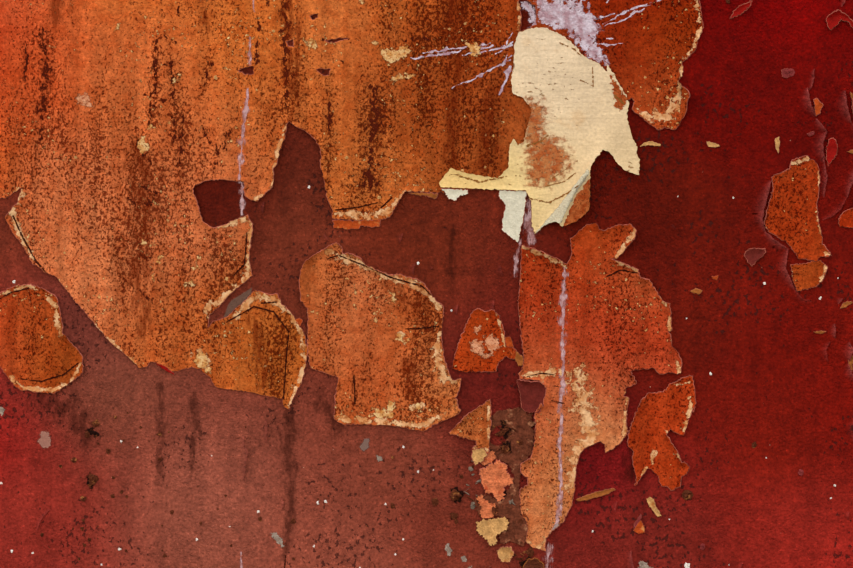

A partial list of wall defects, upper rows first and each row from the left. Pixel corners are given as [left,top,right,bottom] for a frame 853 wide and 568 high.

corrosion [35,28,53,141]
corrosion [143,34,187,168]
corrosion [203,127,231,169]
corrosion [252,17,266,66]
corrosion [266,0,295,108]
corrosion [357,82,390,195]
peeling [0,0,704,432]
peeling [764,138,853,291]
peeling [449,223,697,563]